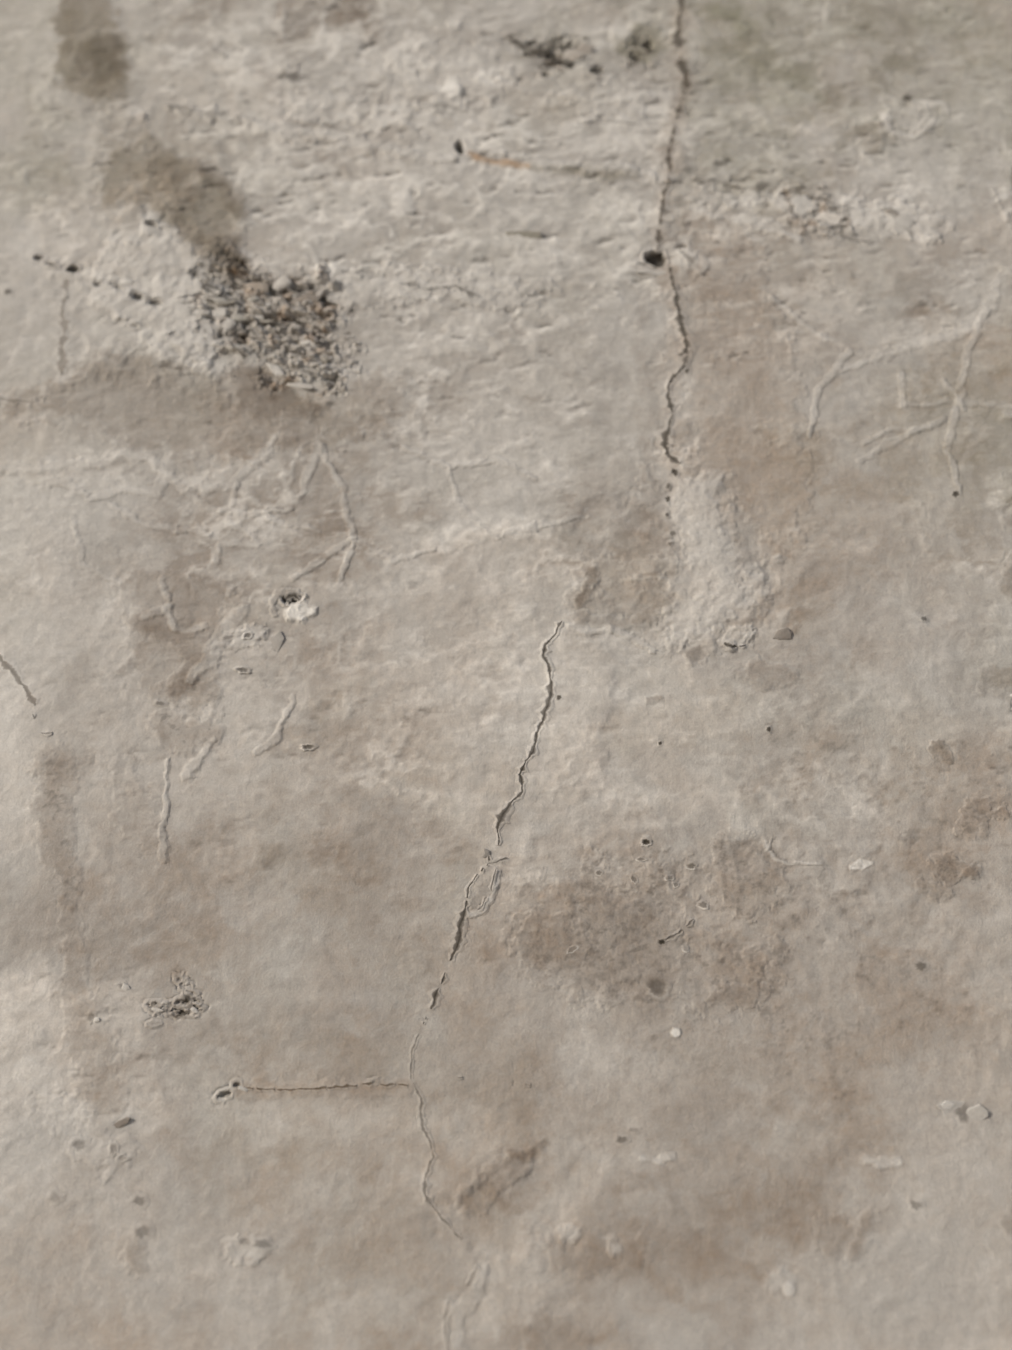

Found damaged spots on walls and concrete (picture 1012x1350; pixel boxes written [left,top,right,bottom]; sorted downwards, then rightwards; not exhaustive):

damp [44,0,257,268]
spalling [492,17,670,81]
spalling [28,237,373,412]
crack [643,0,778,548]
crack [0,651,52,737]
crack [211,620,564,1350]
damp [497,826,801,1033]